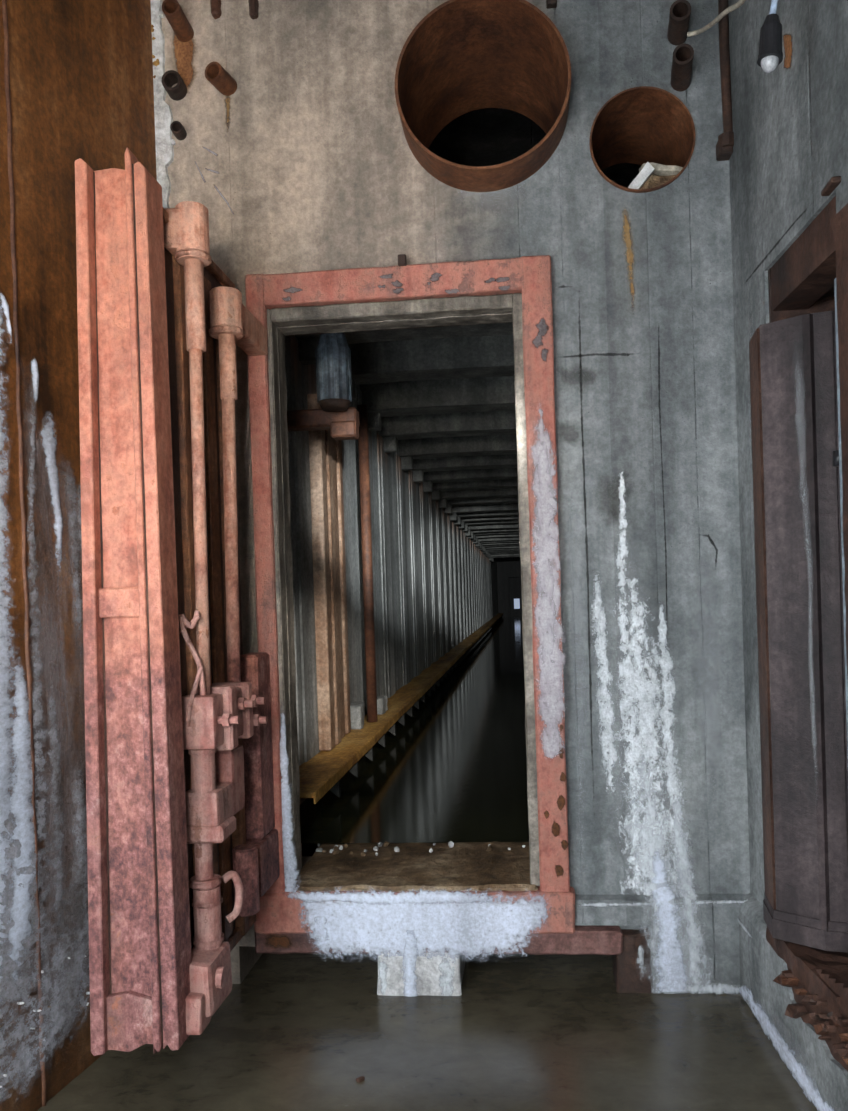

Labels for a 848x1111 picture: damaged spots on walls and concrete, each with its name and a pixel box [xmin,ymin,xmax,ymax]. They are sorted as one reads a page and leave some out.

rust [173,33,195,94]
peeling [532,318,549,361]
water stain [0,293,90,1100]
water stain [280,714,548,997]
peeling [531,409,569,850]
water stain [590,472,740,994]
rust [107,990,153,1052]
spalling [773,965,848,1072]